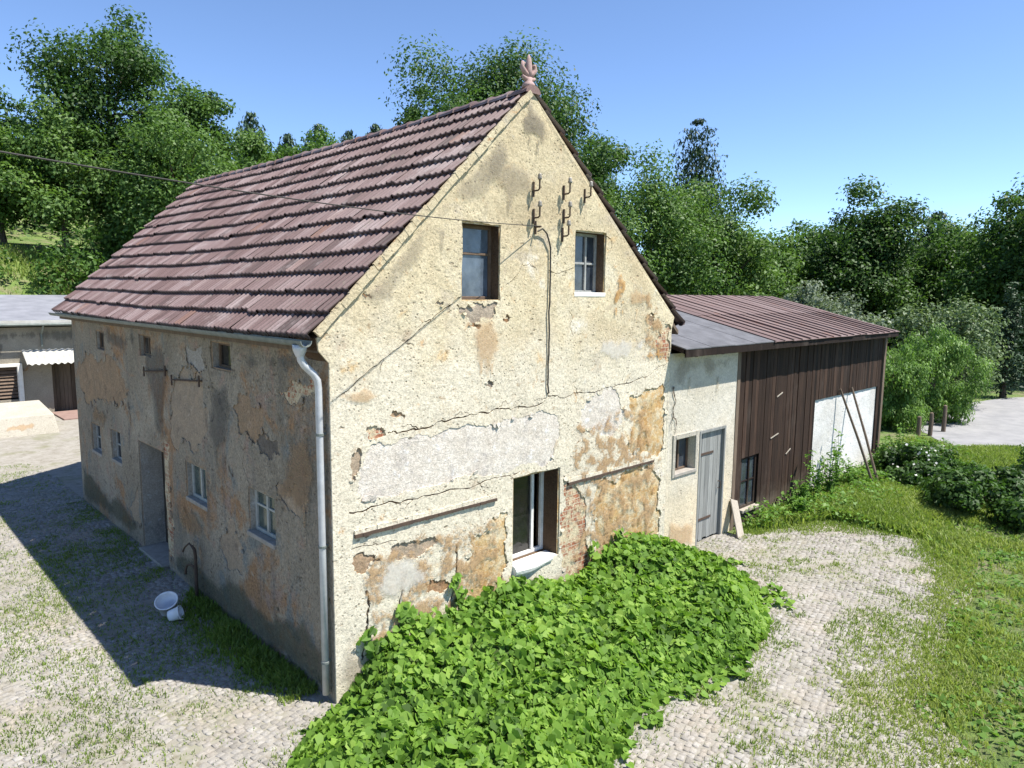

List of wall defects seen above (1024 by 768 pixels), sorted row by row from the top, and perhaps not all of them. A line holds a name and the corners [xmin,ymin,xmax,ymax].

flaking render [457,302,510,329]
flaking render [280,380,315,405]
crack [388,365,677,434]
flaking render [164,345,209,561]
flaking render [258,427,280,460]
flaking render [349,448,362,482]
flaking render [366,425,385,441]
crack [349,472,518,514]
flaking render [558,383,668,582]
flaking render [352,537,438,574]
flaking render [461,512,508,599]
flaking render [426,577,449,593]